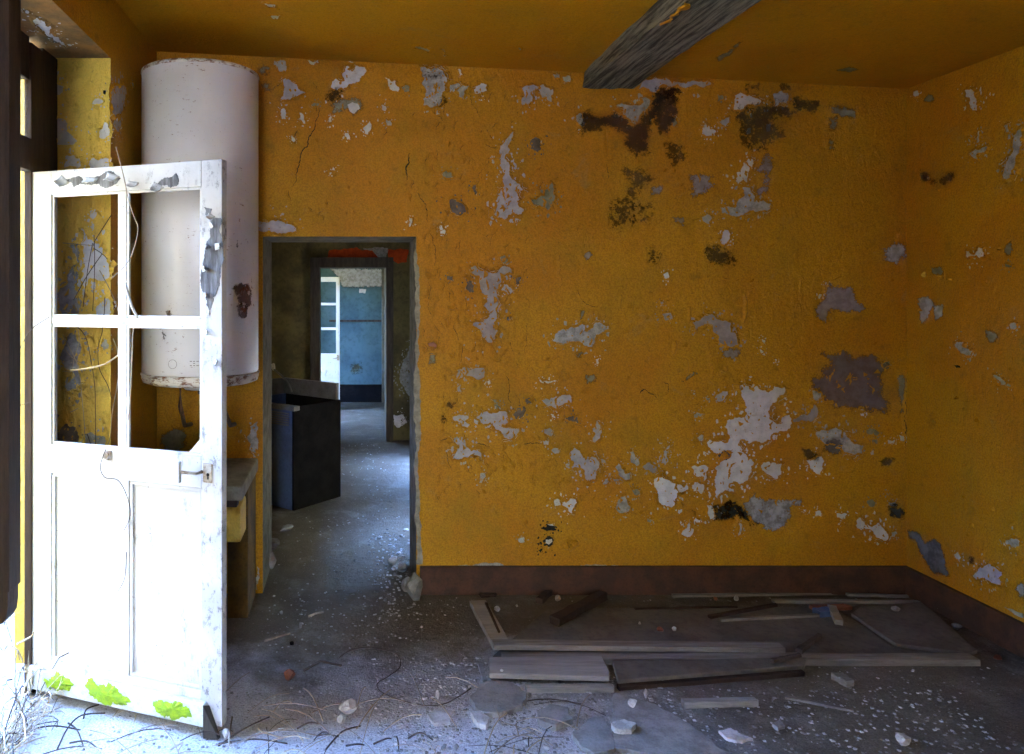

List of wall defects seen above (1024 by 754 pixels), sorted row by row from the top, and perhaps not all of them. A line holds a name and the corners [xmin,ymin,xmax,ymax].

peeling [433,73,573,236]
water stain [581,87,686,228]
water stain [732,83,819,151]
peeling [957,84,1024,183]
peeling [54,64,179,445]
peeling [440,253,907,556]